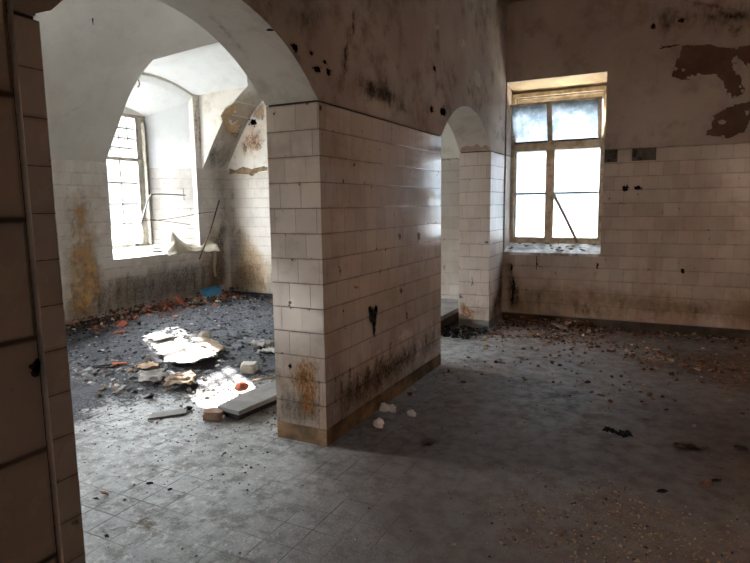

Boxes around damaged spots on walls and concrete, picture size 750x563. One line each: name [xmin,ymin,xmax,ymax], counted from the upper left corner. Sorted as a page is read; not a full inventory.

flaking render [672,39,750,138]
flaking render [220,103,257,134]
flaking render [228,166,268,176]
leakage [368,306,378,337]